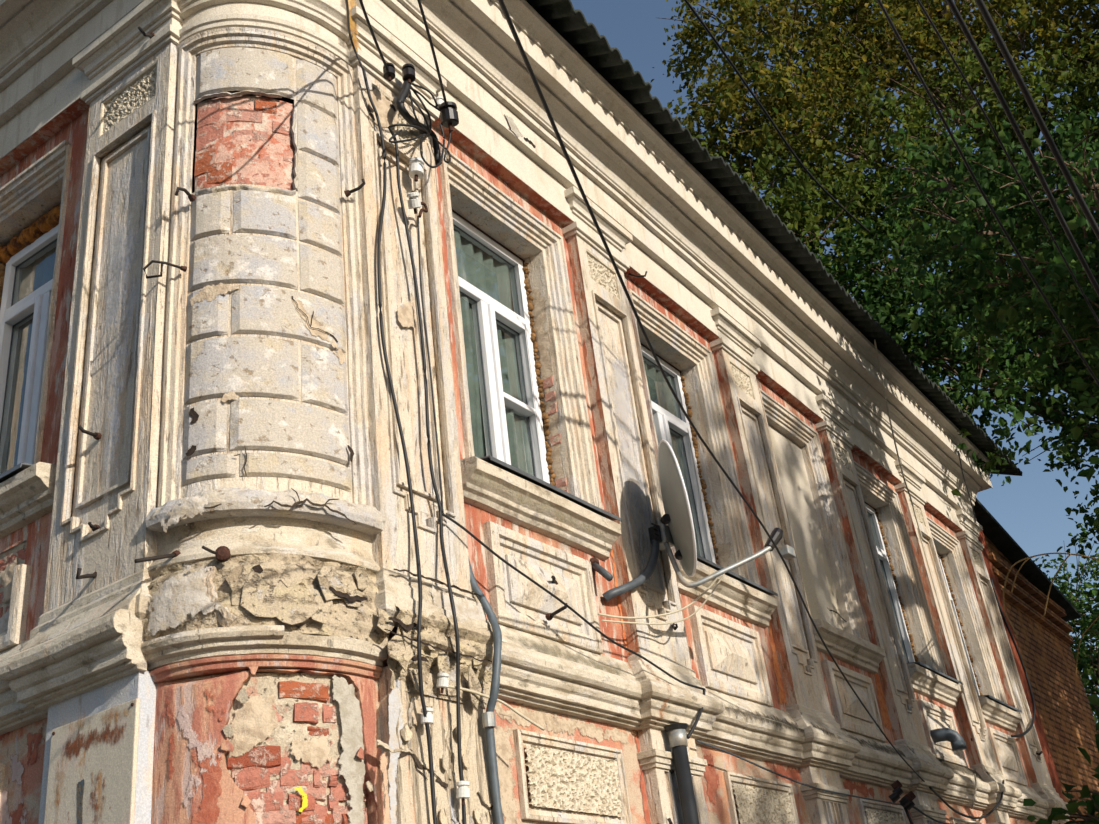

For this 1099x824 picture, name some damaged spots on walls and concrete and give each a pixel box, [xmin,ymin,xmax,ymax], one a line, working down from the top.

spalling [193,90,299,196]
crack [264,488,357,524]
spalling [0,540,27,633]
peeling [611,549,640,653]
spalling [145,563,492,824]
peeling [494,702,651,824]